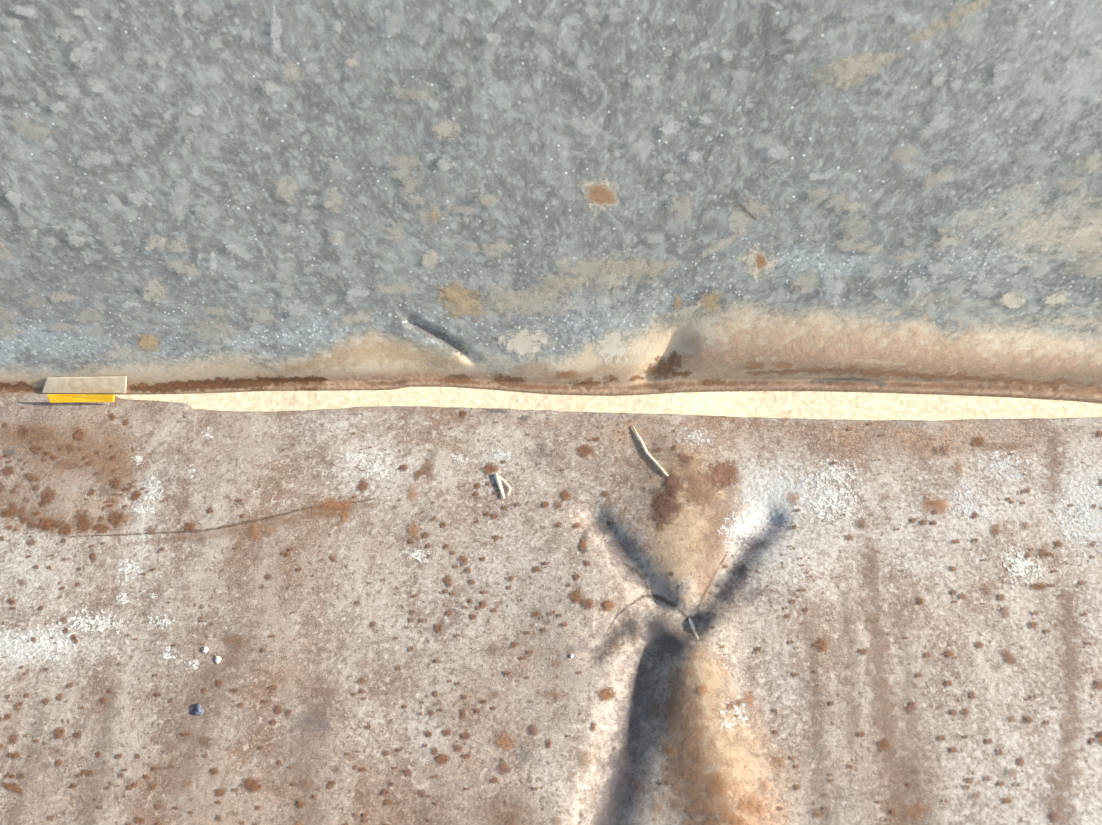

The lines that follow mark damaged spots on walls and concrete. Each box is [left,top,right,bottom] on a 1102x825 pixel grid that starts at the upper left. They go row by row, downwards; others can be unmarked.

leakage [438,255,678,366]
leakage [666,291,722,324]
rust [444,374,471,383]
rust [488,374,525,387]
leakage [717,459,868,552]
rust [0,376,1102,825]
leakage [703,565,748,600]
leakage [645,614,696,657]
leakage [715,699,751,729]
leakage [595,665,645,825]